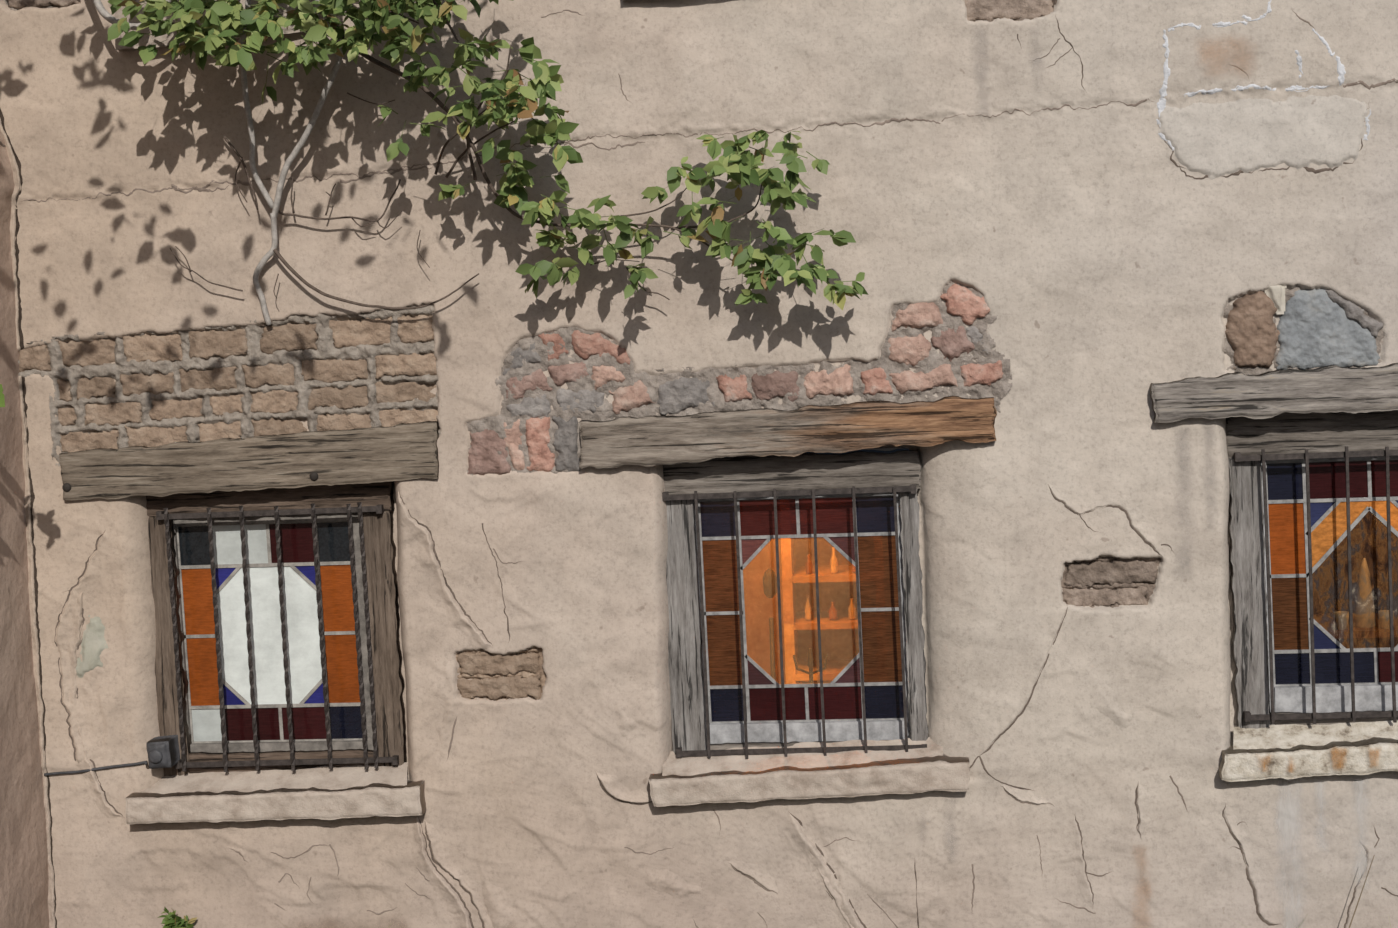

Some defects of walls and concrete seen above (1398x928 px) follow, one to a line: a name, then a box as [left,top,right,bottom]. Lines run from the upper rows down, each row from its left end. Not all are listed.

flaking render [964,0,1057,22]
crack [0,18,1398,352]
flaking render [18,303,442,466]
flaking render [466,280,1012,476]
flaking render [1222,285,1385,375]
crack [18,376,123,928]
crack [396,489,521,650]
flaking render [456,646,546,701]
flaking render [1061,556,1161,608]
crack [969,601,1113,914]
crack [367,815,494,928]
crack [1222,803,1282,926]